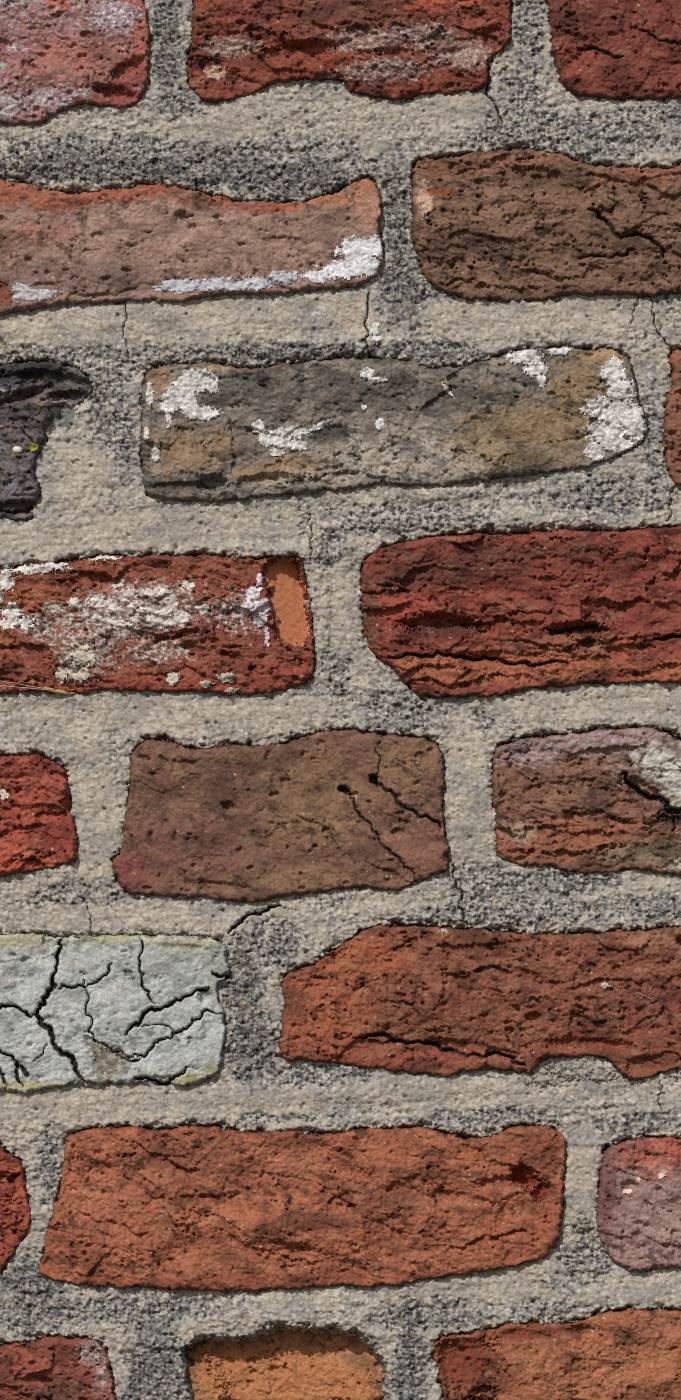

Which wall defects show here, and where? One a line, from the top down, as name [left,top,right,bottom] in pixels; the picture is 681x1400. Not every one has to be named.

water stain [0,554,276,686]
water stain [200,672,239,695]
crack [623,772,681,832]
crack [0,899,230,1089]